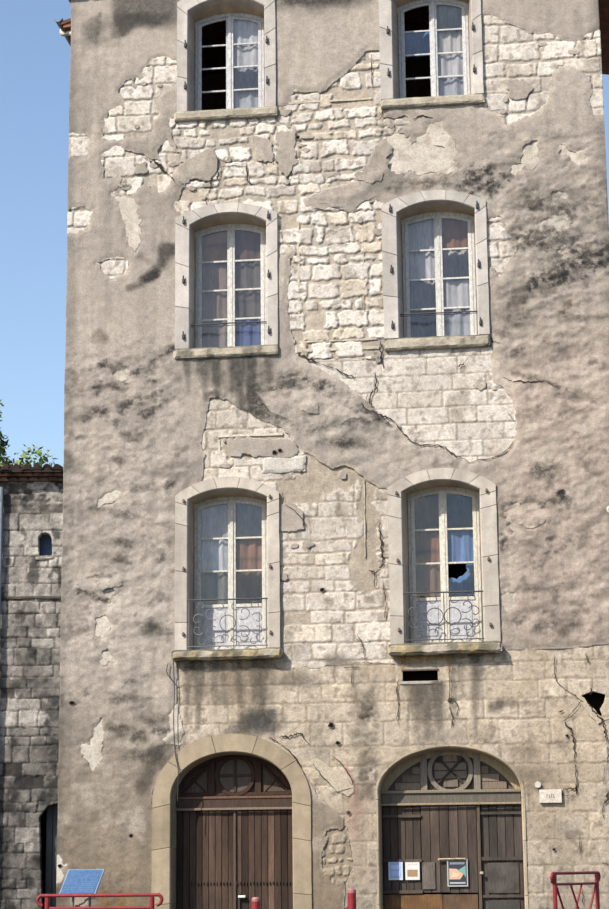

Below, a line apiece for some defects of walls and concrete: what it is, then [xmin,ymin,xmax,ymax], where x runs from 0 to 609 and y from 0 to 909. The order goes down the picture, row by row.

leakage [115,0,175,35]
spalling [479,15,604,125]
leakage [129,243,175,289]
spalling [101,51,518,462]
crack [296,342,514,462]
spalling [202,398,402,669]
crack [369,524,387,618]
peeling [80,718,105,771]
leakage [231,709,278,734]
crack [268,732,355,792]
crack [554,654,609,817]
spalling [582,692,605,716]